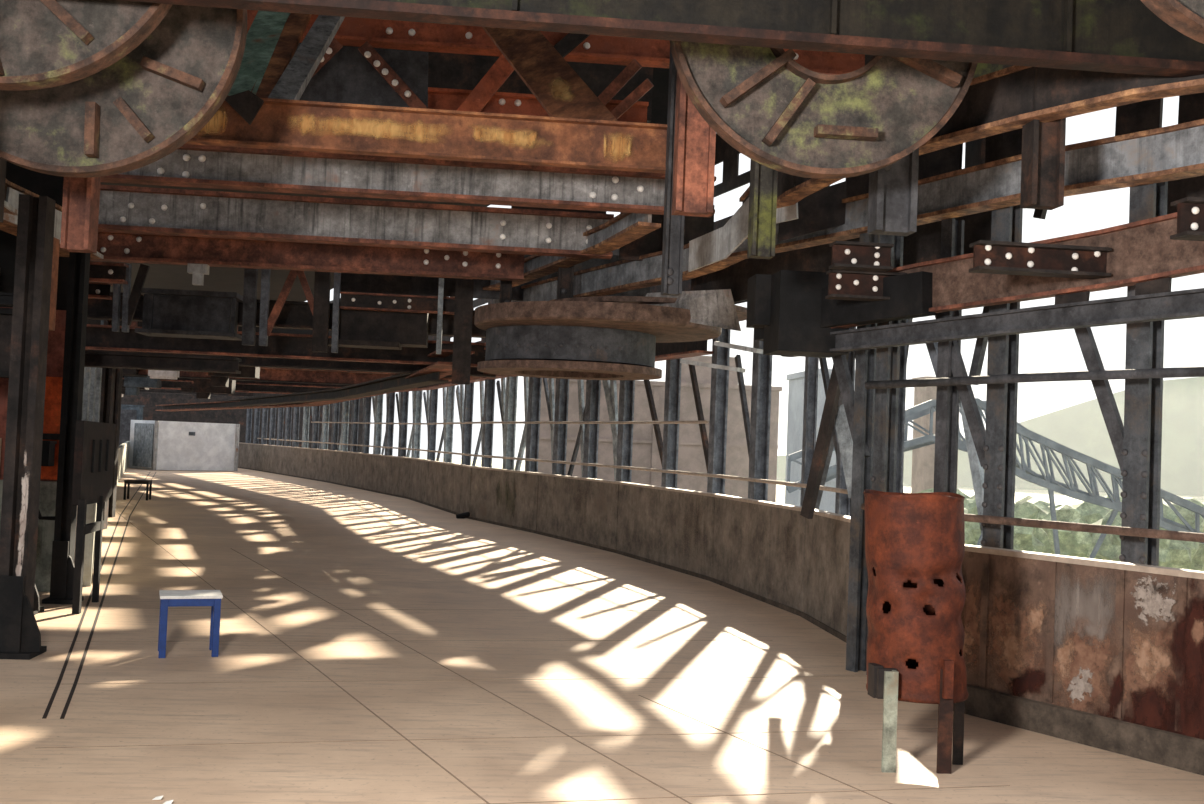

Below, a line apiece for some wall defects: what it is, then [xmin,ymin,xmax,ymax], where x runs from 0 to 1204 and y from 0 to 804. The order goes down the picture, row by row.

rust [290,116,441,141]
rust [474,128,536,145]
rust [604,136,630,159]
peeling [1131,575,1177,626]
rust [986,579,1204,740]